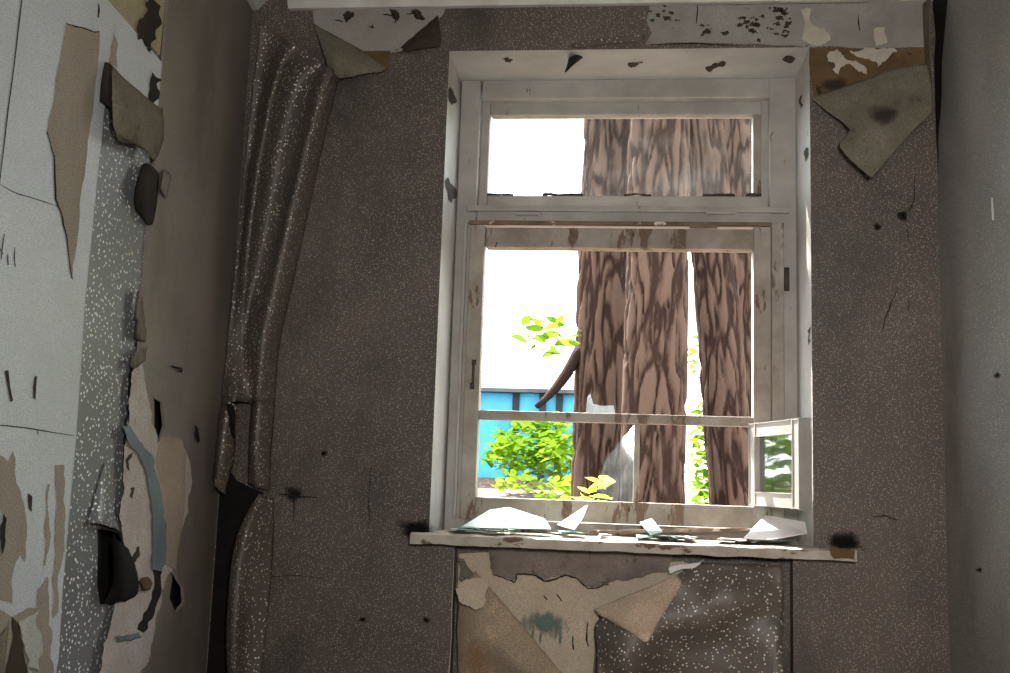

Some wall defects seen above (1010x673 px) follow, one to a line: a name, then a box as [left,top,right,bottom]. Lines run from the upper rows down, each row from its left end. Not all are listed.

flaking render [313,8,446,72]
peeling [47,23,118,280]
peeling [0,452,66,673]
flaking render [97,364,192,673]
flaking render [458,547,689,673]